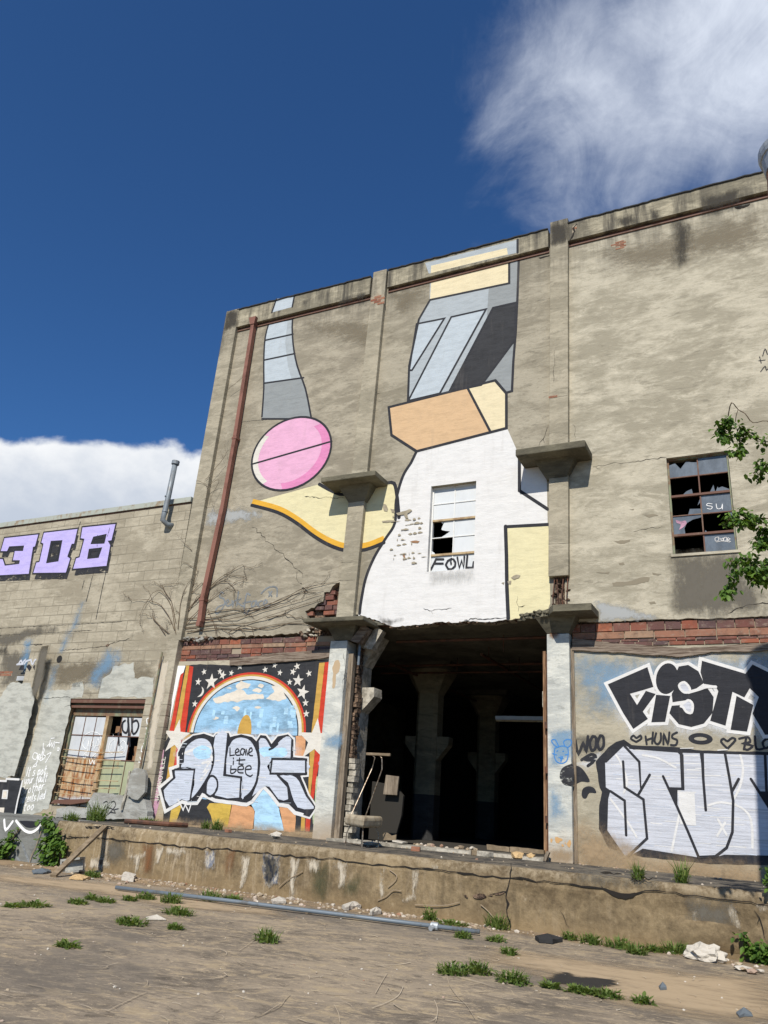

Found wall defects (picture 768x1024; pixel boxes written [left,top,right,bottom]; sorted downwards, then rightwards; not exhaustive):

leakage [609,216,757,266]
peeling [382,504,426,564]
spalling [299,585,340,640]
crack [52,812,768,938]